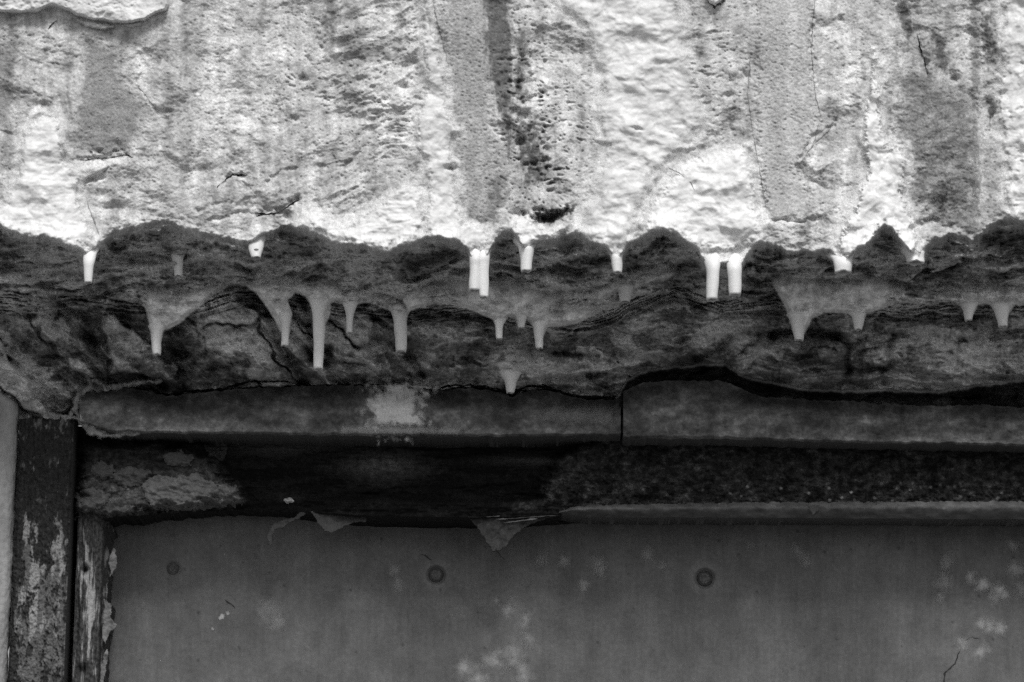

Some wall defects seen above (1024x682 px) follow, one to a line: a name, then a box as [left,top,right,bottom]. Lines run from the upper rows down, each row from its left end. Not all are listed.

damp [484,0,548,185]
damp [838,0,1024,257]
crack [258,200,298,216]
damp [511,212,562,248]
crack [172,380,307,394]
peeling [74,449,243,514]
crack [943,636,974,682]